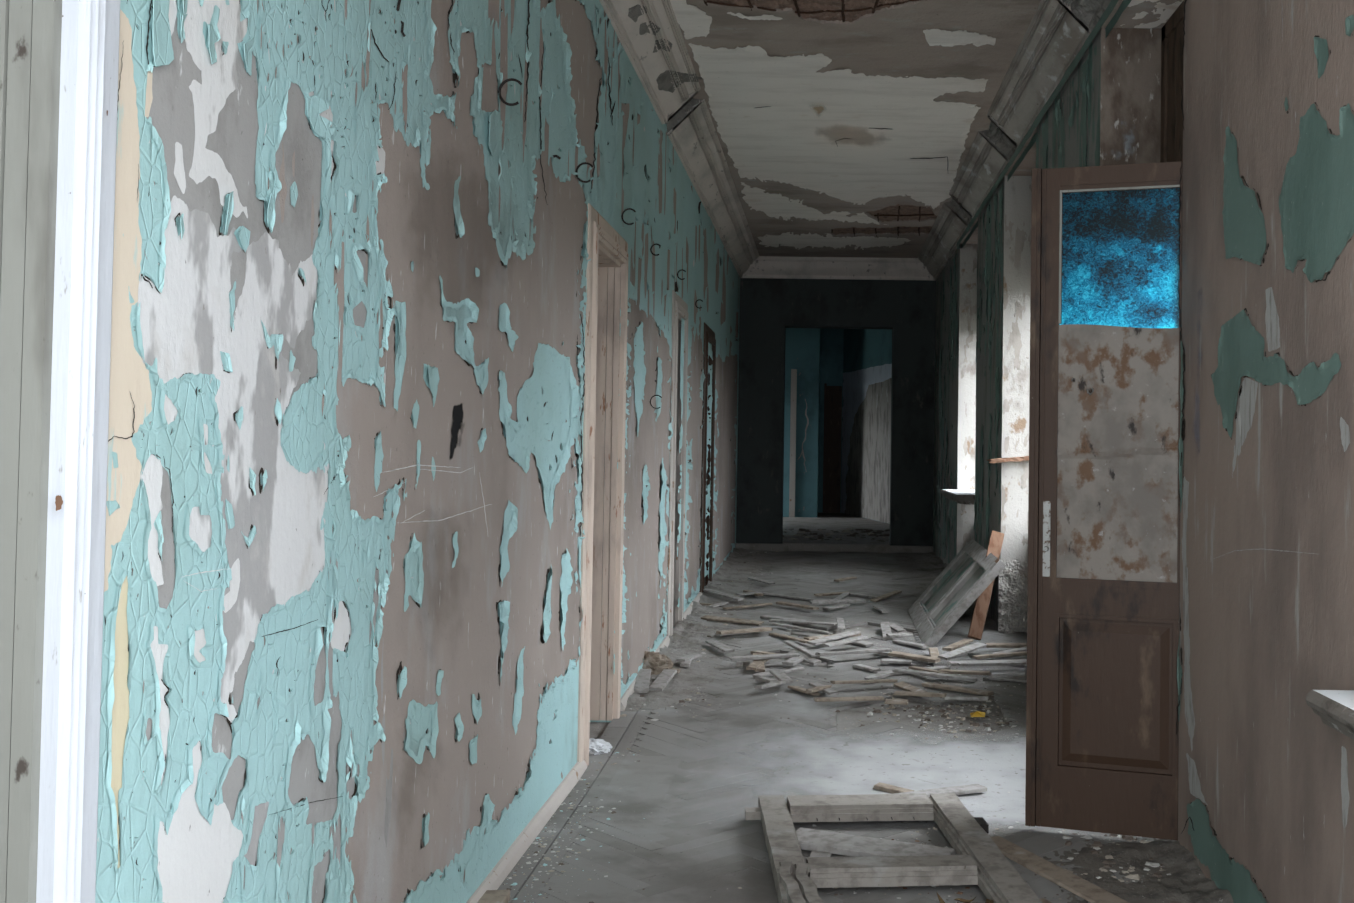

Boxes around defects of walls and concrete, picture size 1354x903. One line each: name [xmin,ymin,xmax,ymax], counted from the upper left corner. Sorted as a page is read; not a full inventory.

peeling [670,0,996,250]
peeling [1120,0,1183,28]
peeling [1222,97,1354,283]
peeling [1314,35,1331,78]
peeling [1211,308,1341,440]
crack [108,393,174,532]
peeling [98,0,739,903]
peeling [1187,799,1267,903]